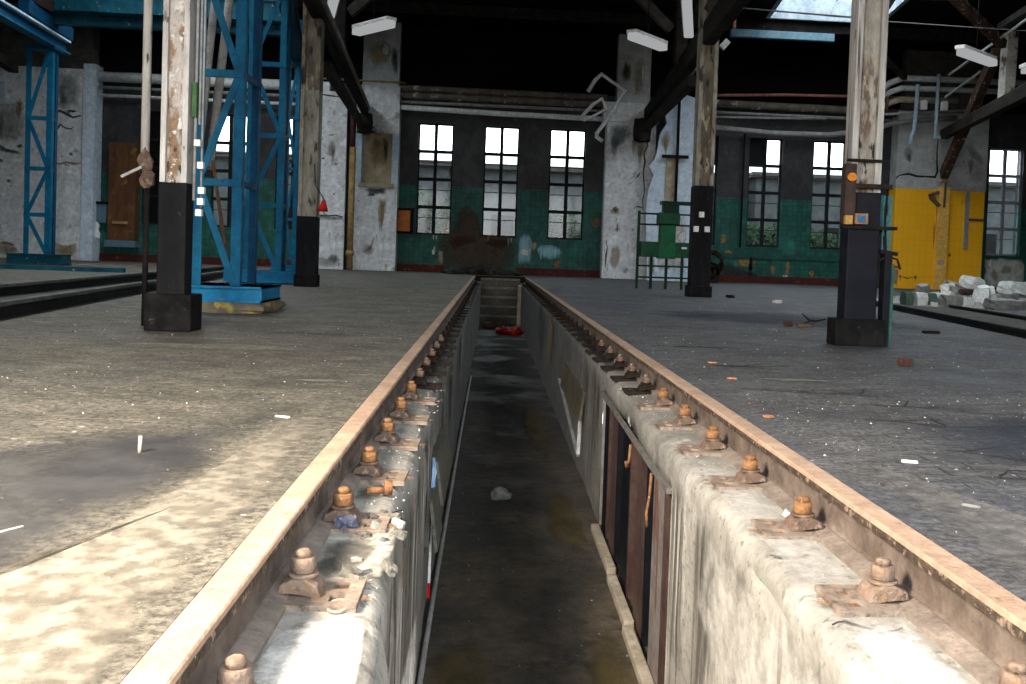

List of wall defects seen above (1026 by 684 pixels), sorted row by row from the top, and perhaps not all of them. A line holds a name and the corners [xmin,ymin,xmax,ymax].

crack [58,109,81,130]
crack [634,142,648,211]
peeling [519,236,560,261]